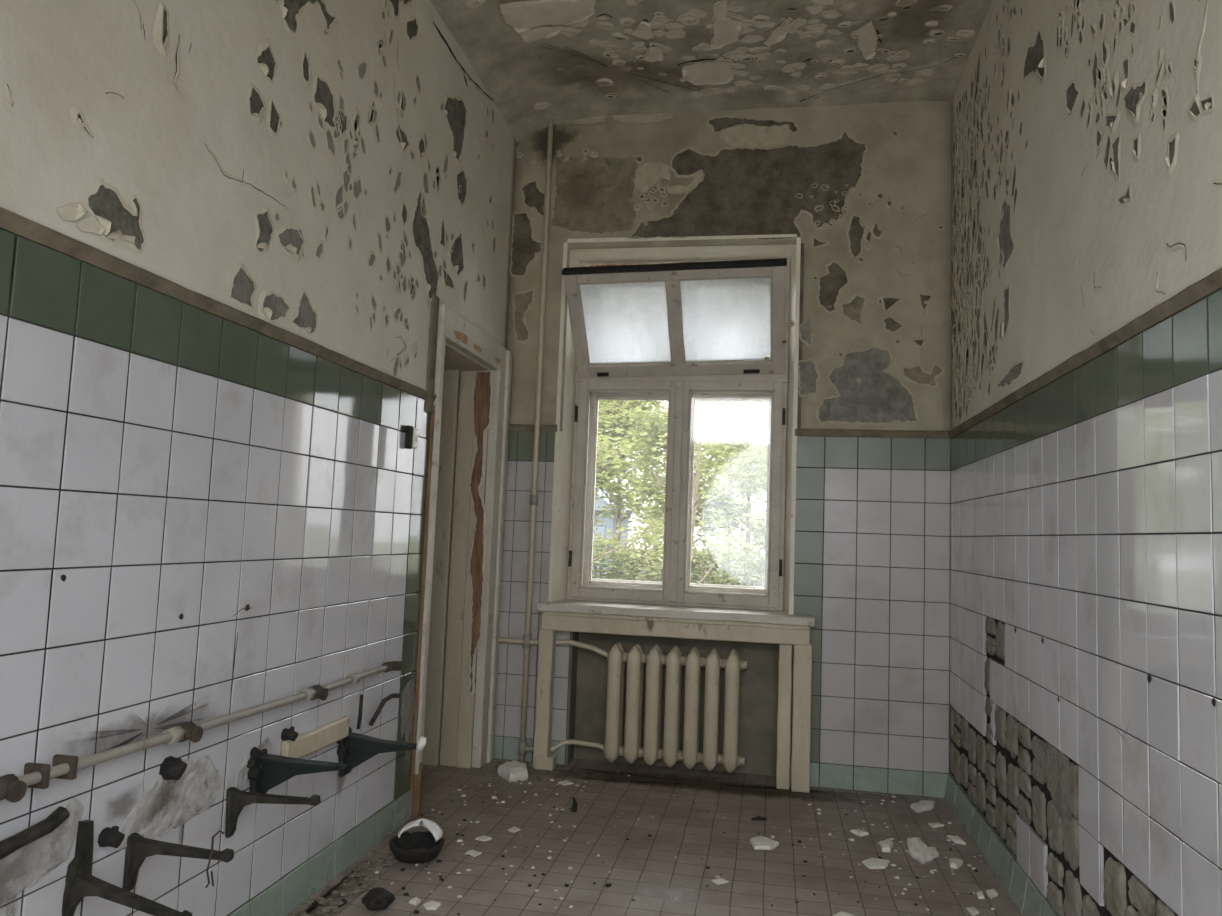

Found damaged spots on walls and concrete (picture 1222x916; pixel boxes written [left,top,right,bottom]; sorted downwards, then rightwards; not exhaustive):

peeling [246,39,283,137]
peeling [1187,92,1215,122]
peeling [56,178,146,254]
peeling [254,0,486,377]
peeling [466,0,1180,426]
peeling [228,262,318,337]
peeling [950,616,1178,916]